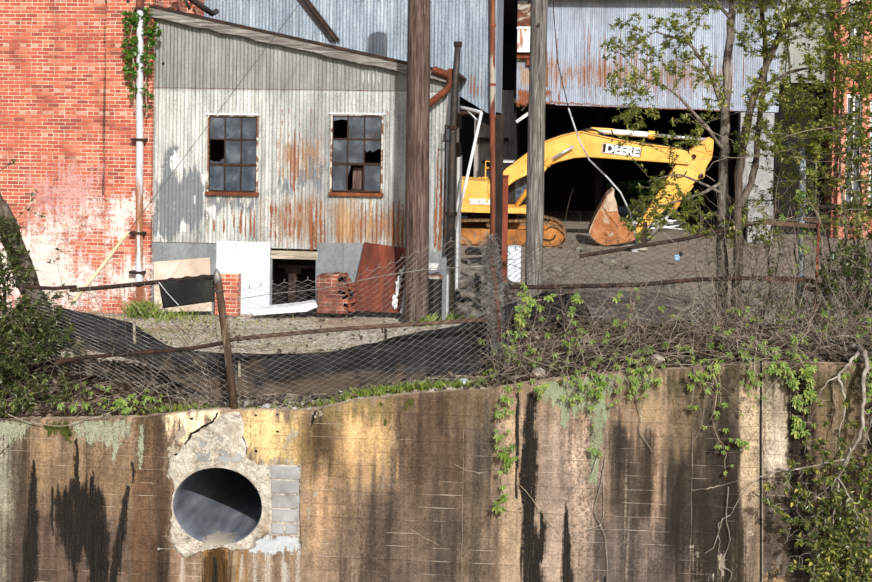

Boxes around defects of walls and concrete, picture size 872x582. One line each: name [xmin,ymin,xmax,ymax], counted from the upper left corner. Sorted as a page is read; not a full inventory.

corrosion [516,88,529,108]
corrosion [546,23,744,111]
peeling [152,145,328,242]
corrosion [261,109,405,313]
spalling [166,417,193,461]
crack [179,412,218,465]
water stain [22,438,136,582]
water stain [515,388,547,582]
water stain [560,502,573,582]